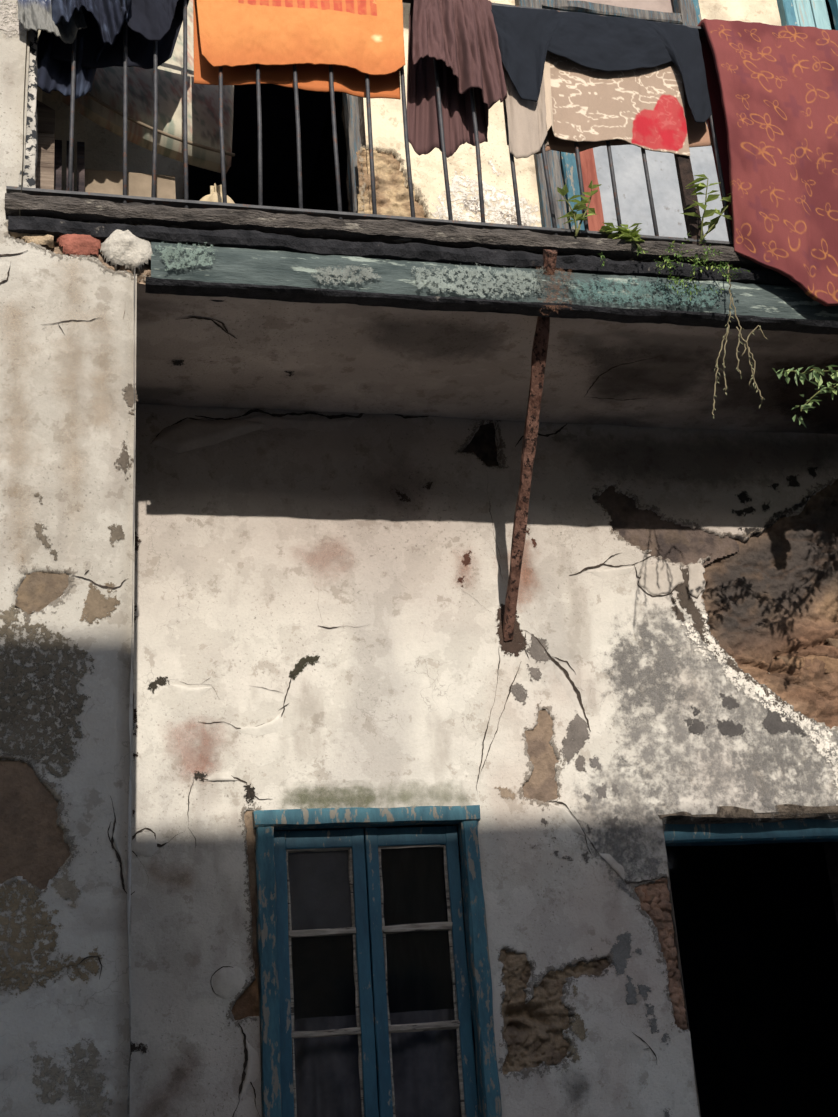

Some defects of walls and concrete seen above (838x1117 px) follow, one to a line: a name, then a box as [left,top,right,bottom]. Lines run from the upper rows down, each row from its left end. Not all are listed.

crack [0,250,28,284]
crack [195,409,365,432]
crack [395,412,428,420]
peeling [0,523,104,996]
peeling [80,582,138,626]
peeling [108,524,141,552]
crack [166,658,318,736]
crack [476,627,591,793]
spalling [495,604,620,863]
water stain [577,610,838,888]
spalling [589,467,838,806]
spalling [498,872,688,1080]